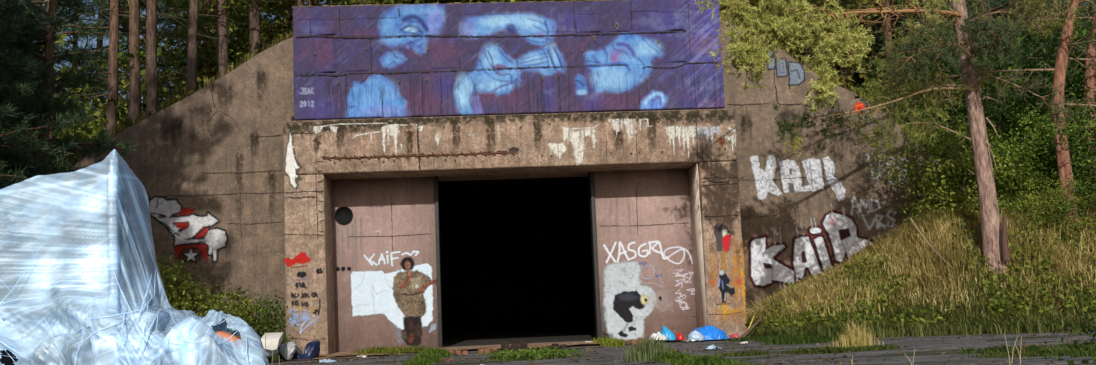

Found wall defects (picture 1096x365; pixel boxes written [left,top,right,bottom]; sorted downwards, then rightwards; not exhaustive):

damp [533,115,736,167]